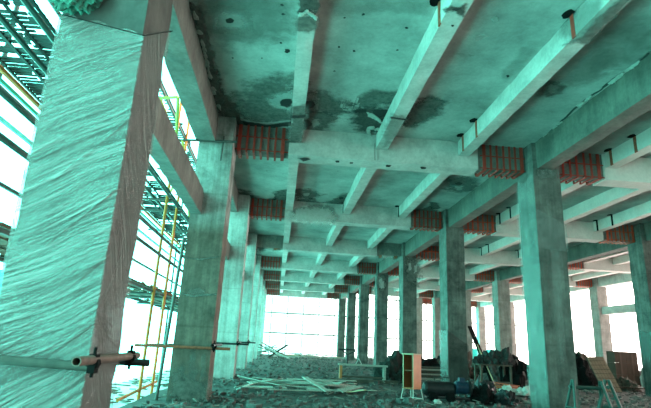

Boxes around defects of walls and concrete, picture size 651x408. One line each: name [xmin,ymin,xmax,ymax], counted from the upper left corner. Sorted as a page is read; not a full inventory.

leakage [190,5,350,143]
leakage [391,96,445,127]